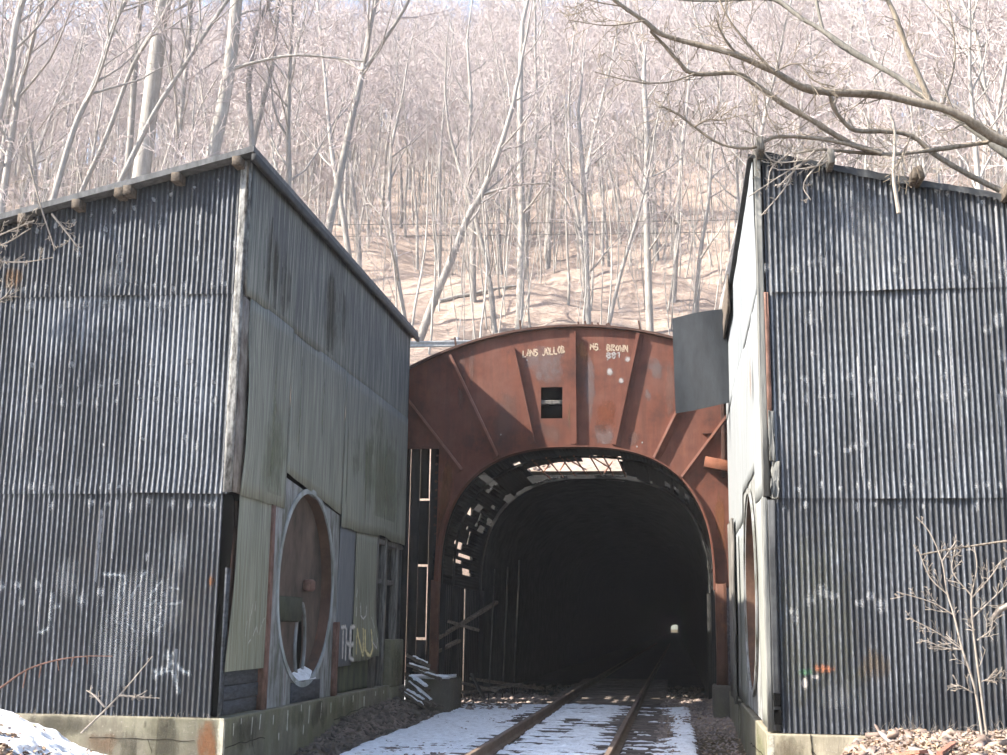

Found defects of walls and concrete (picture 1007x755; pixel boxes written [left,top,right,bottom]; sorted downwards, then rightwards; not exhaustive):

water stain [327,279,345,351]
rust [199,725,216,755]